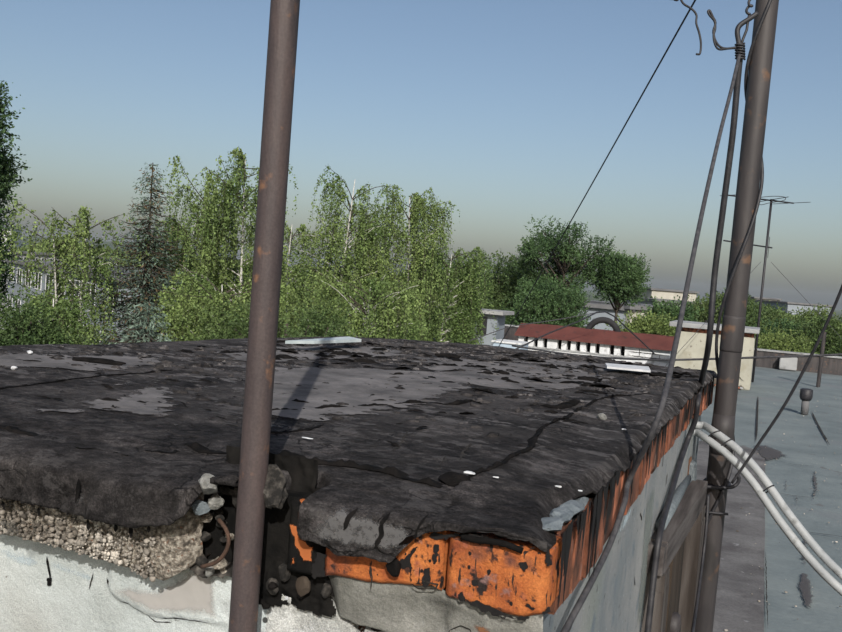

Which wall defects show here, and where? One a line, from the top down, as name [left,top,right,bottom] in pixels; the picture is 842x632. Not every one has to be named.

peeling [38,372,188,417]
peeling [0,346,247,374]
crack [218,347,244,355]
crack [271,348,646,488]
peeling [271,340,700,429]
spalling [268,452,318,508]
spalling [0,498,156,582]
spalling [200,508,235,543]
peeling [399,532,488,590]
flaking render [121,554,233,625]
crack [357,624,381,632]
peeling [458,580,551,621]